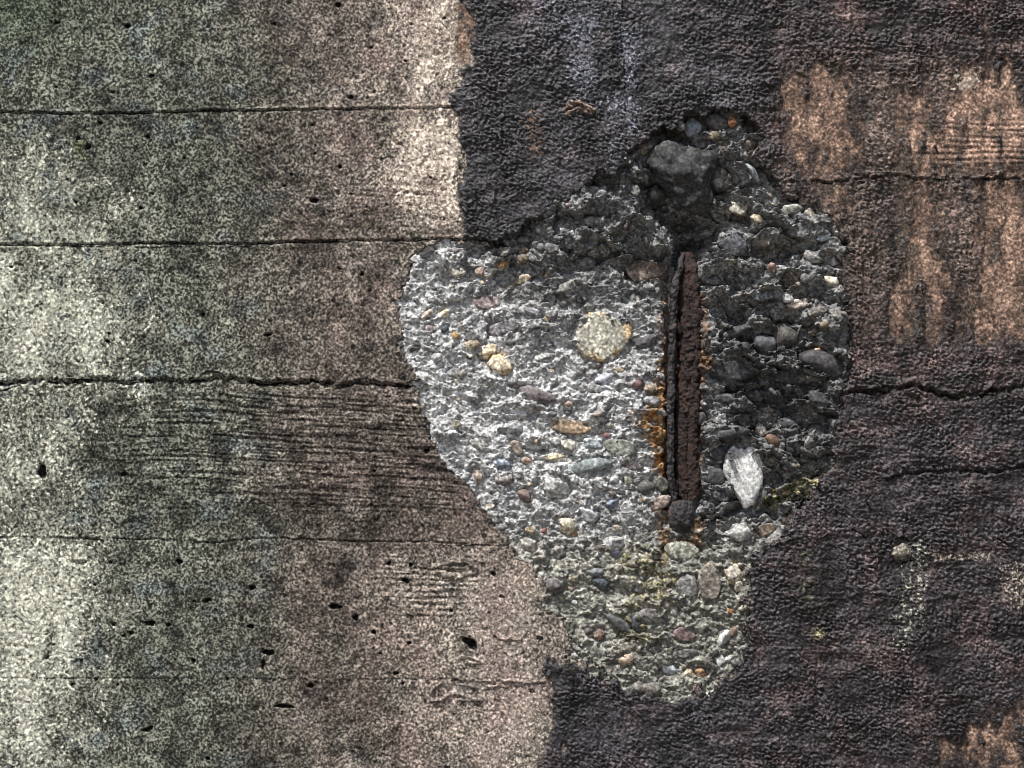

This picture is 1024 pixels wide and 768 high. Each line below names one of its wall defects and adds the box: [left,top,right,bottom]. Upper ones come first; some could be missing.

corrosion [695,285,714,404]
crack [0,358,165,392]
crack [192,370,415,389]
spalling [394,61,868,704]
corrosion [640,266,682,500]
crack [842,384,1023,400]
corrosion [654,508,704,559]